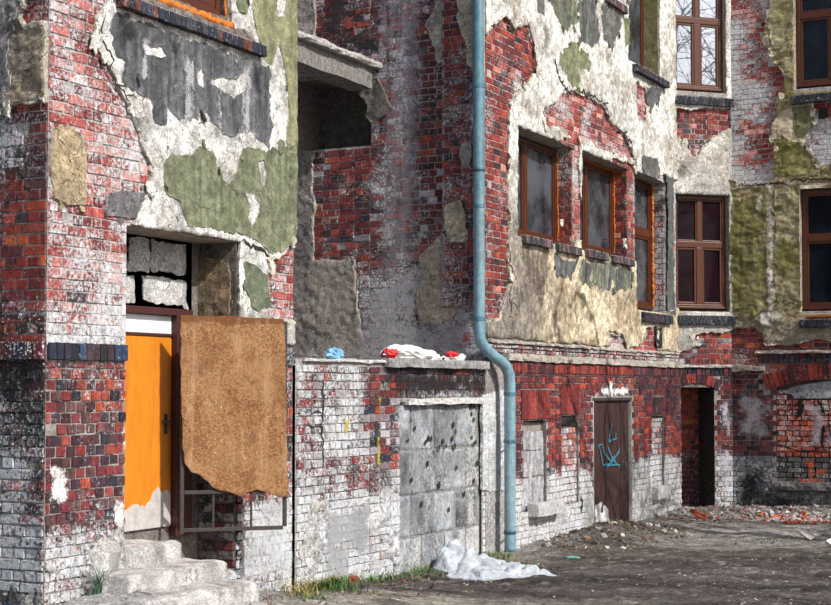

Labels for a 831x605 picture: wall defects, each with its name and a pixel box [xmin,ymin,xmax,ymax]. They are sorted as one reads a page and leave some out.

flaking render [0,0,298,345]
flaking render [310,0,485,376]
flaking render [484,13,542,322]
flaking render [537,0,678,316]
flaking render [608,323,660,357]
flaking render [676,0,831,316]
flaking render [676,328,831,374]
leakage [756,185,780,327]